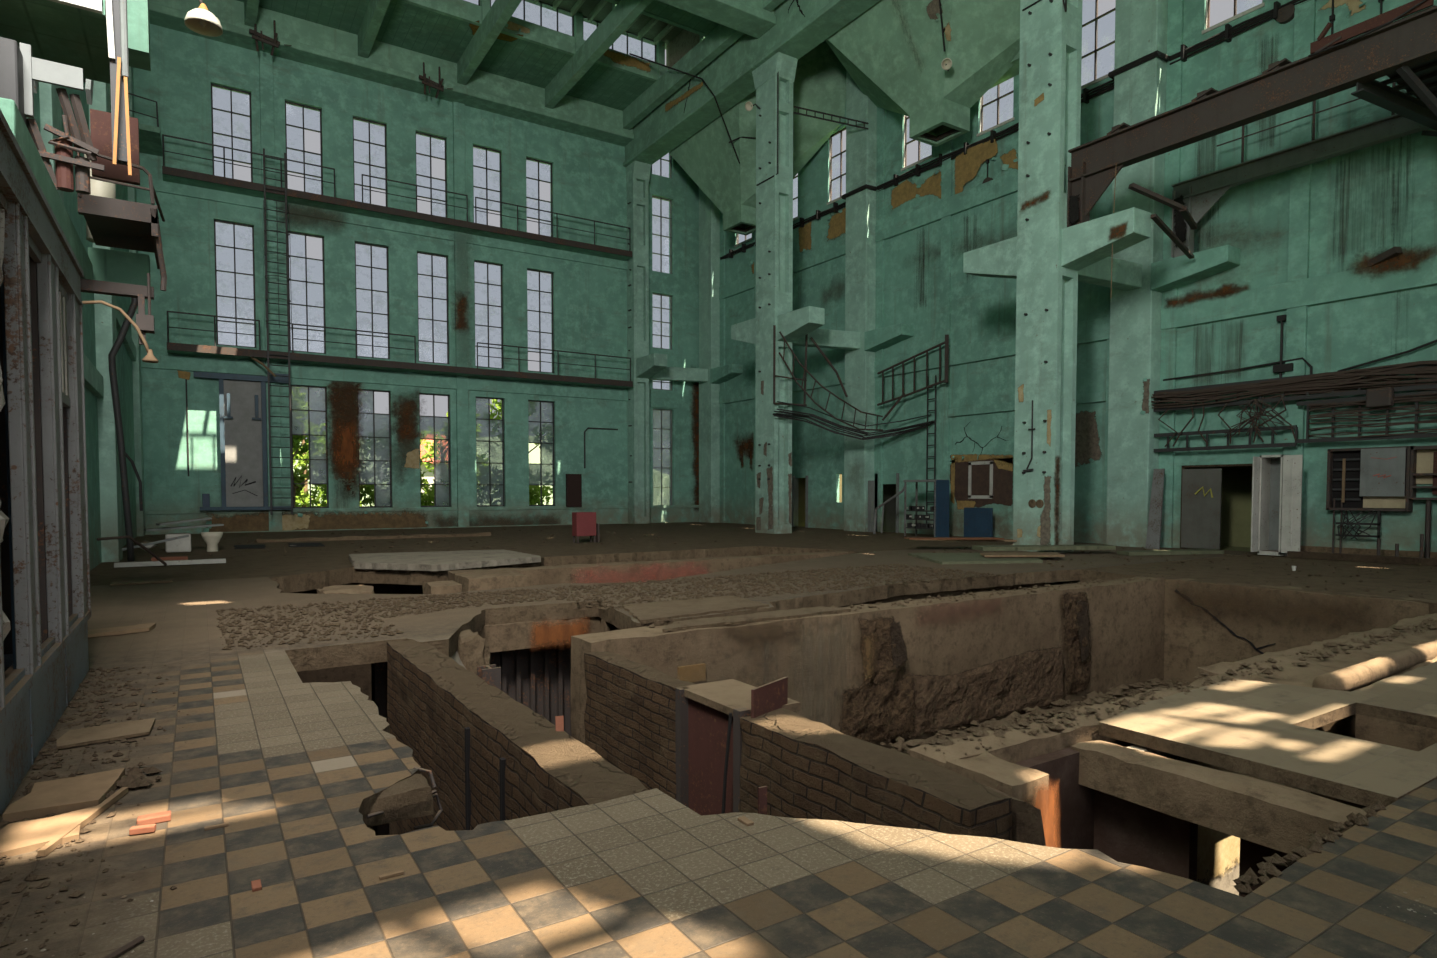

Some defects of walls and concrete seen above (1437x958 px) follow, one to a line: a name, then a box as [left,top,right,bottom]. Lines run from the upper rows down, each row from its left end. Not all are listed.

peeling [888,139,1018,212]
corrosion [1354,247,1436,275]
corrosion [1166,284,1248,307]
crack [1175,589,1275,654]